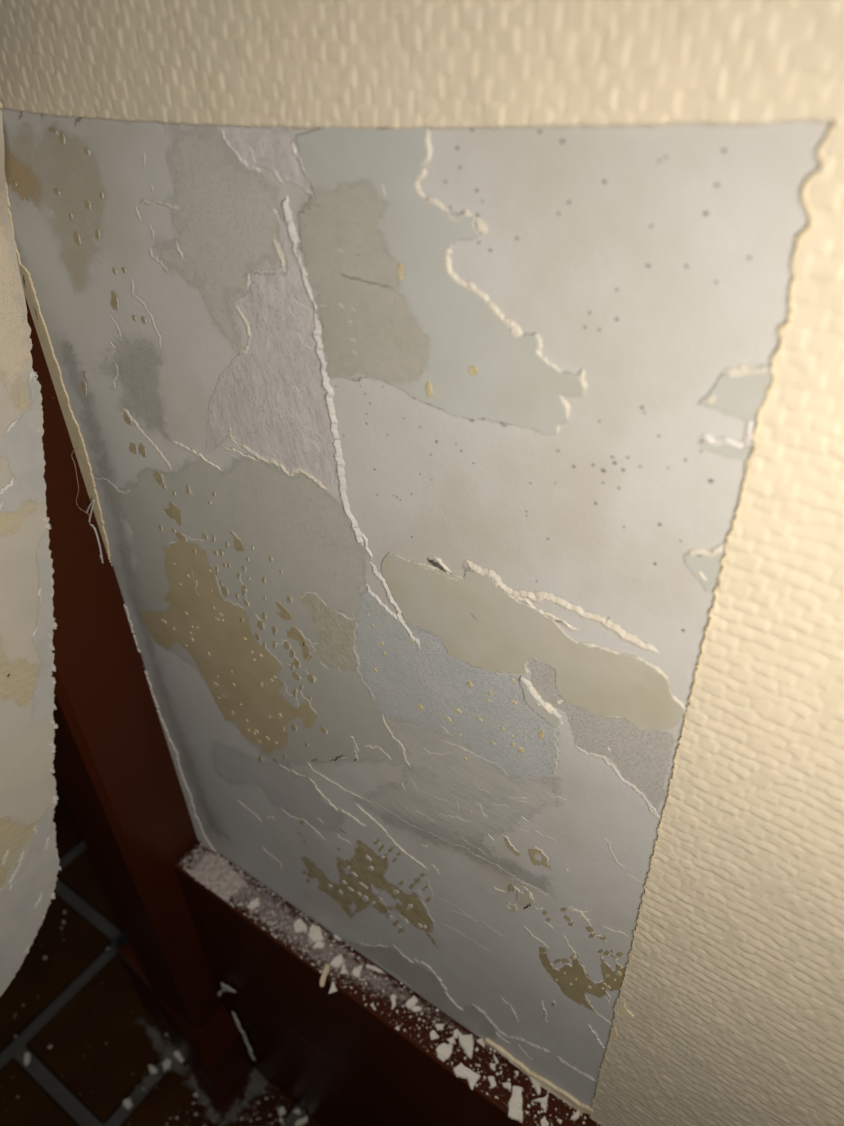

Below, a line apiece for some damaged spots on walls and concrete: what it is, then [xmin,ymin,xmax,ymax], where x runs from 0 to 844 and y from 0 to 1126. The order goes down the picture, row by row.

peeling [293,919,324,949]
peeling [319,954,348,987]
peeling [405,996,421,1012]
peeling [430,1024,444,1040]
peeling [436,1029,474,1062]
peeling [453,1063,480,1090]
peeling [488,1055,499,1089]
peeling [532,1093,549,1109]